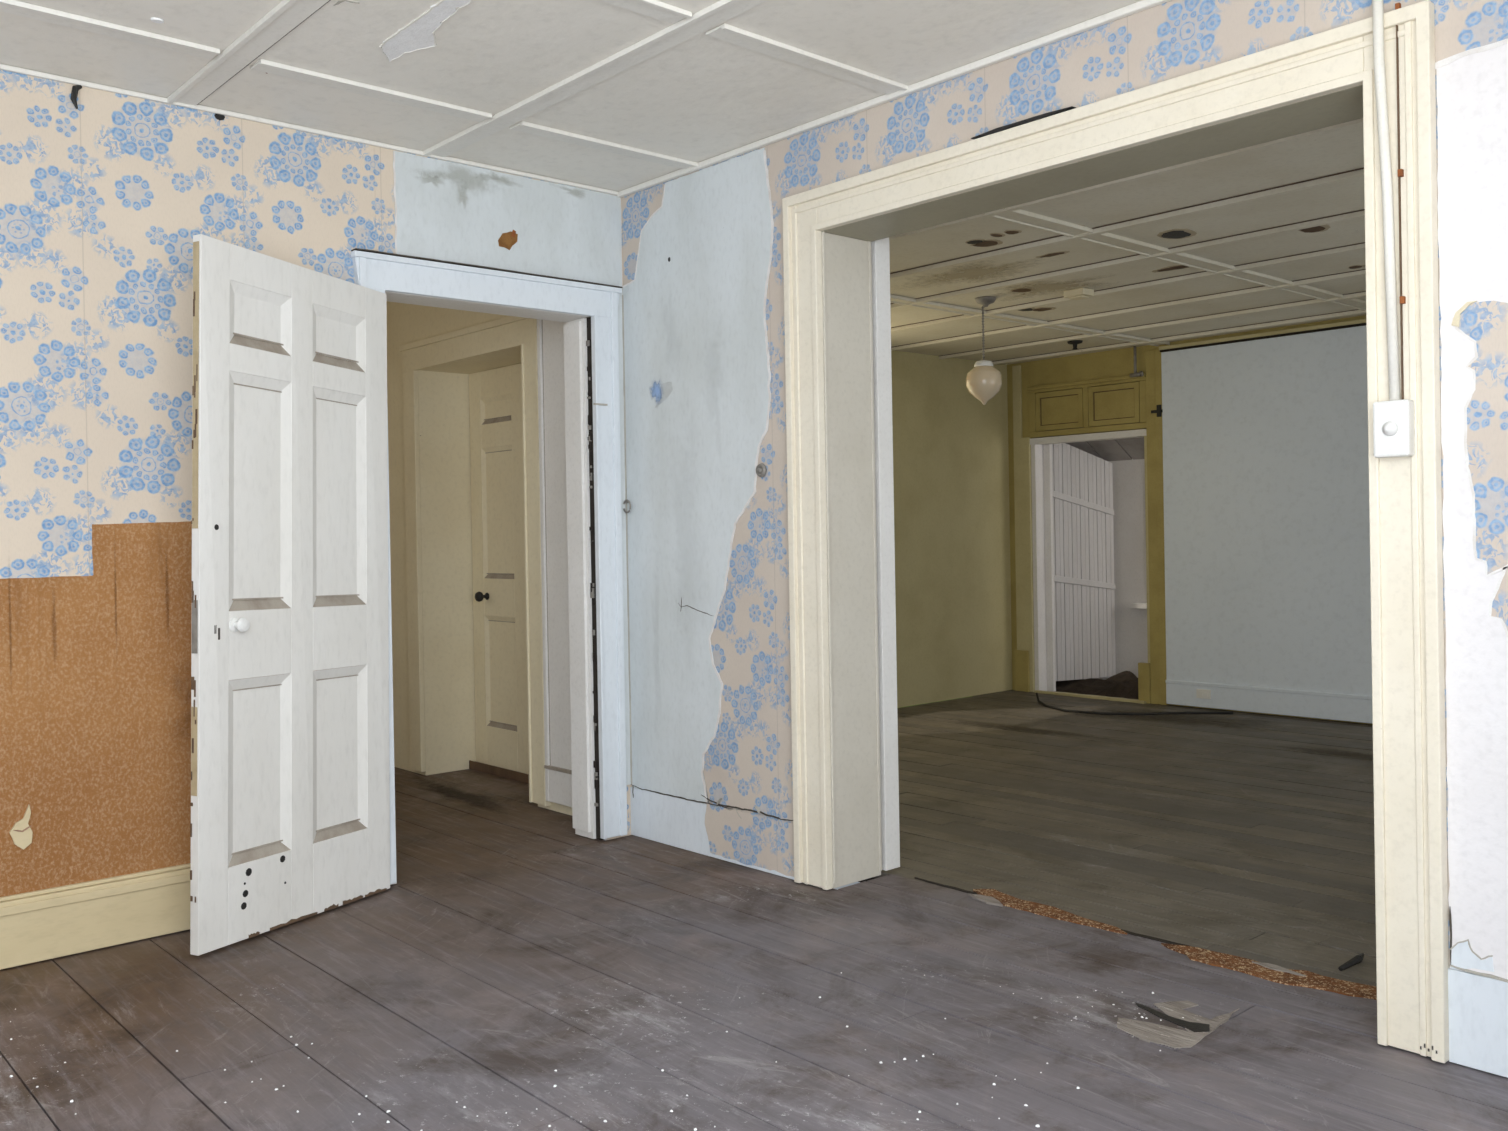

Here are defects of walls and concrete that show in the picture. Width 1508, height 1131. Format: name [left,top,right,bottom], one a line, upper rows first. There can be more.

peeling [379,0,473,63]
peeling [0,520,192,897]
peeling [393,147,774,803]
peeling [1435,39,1508,979]